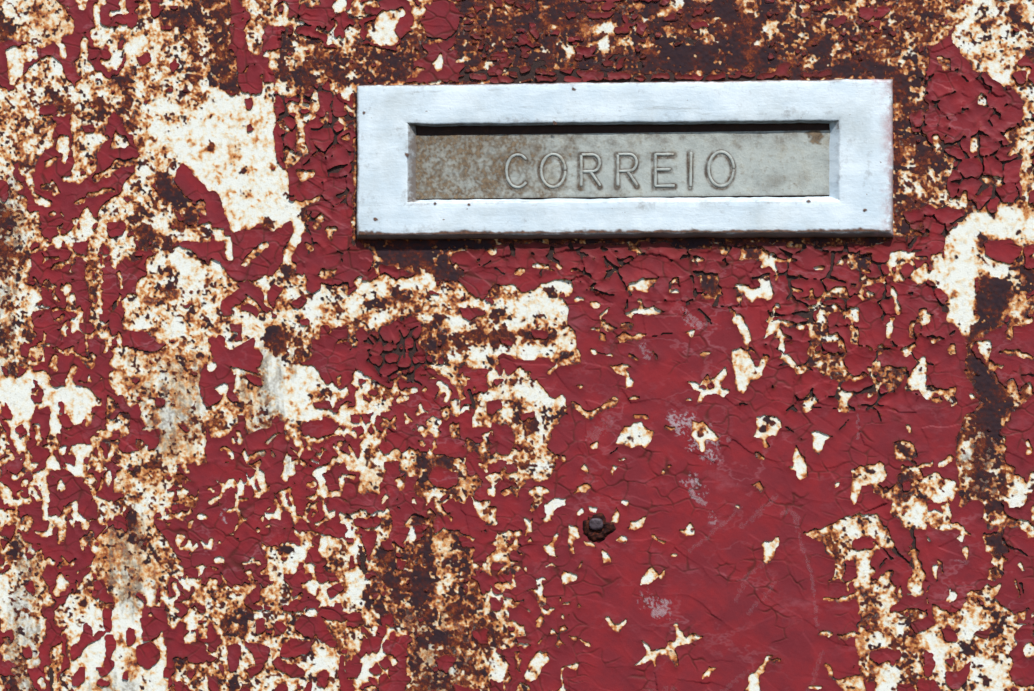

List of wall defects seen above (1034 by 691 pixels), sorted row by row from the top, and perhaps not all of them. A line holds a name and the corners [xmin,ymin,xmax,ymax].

rust [0,514,72,691]
rust [0,0,273,628]
rust [171,452,525,691]
crack [359,546,367,575]
peeling [0,0,731,691]
crack [350,310,475,409]
rust [429,372,567,489]
rust [247,0,1034,398]
crack [462,68,1034,432]
crack [879,528,916,569]
rust [843,565,1030,691]
rust [852,230,1034,575]